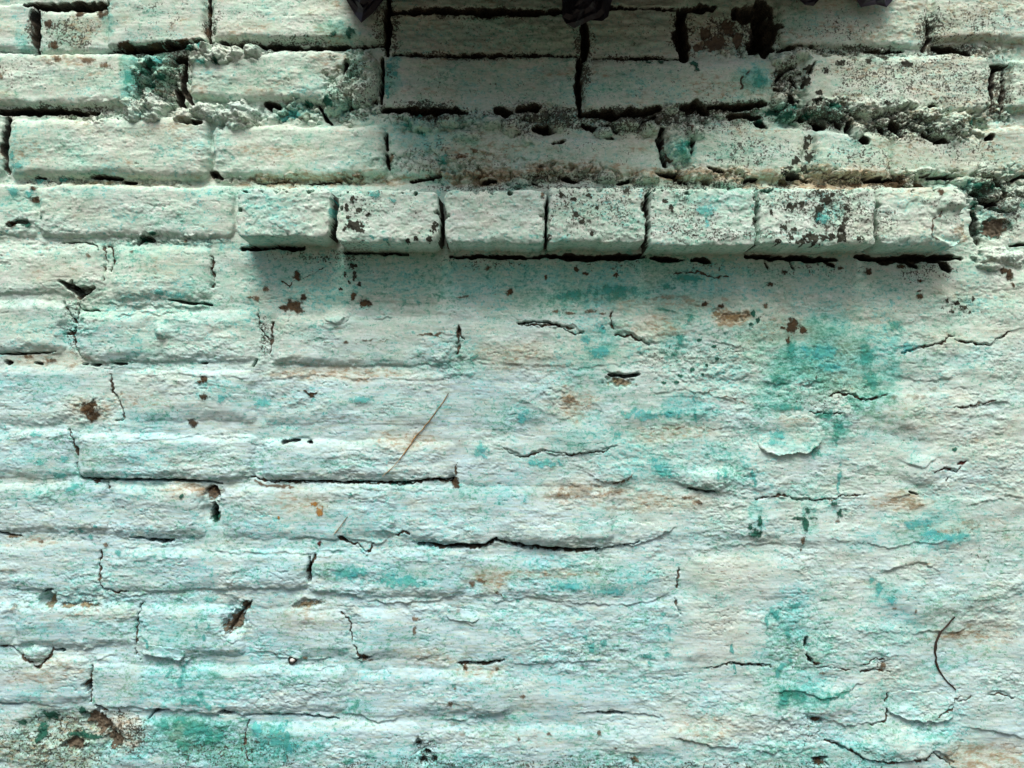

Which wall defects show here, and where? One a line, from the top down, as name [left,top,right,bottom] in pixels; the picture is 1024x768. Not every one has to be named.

peeling [342,195,370,233]
peeling [770,190,865,248]
spalling [977,218,1007,239]
damp [780,317,842,372]
damp [888,319,918,355]
crack [905,331,1010,353]
damp [855,344,881,392]
crack [809,392,887,414]
damp [815,408,847,446]
crack [338,530,638,553]
spalling [223,600,252,634]
crack [824,739,950,766]